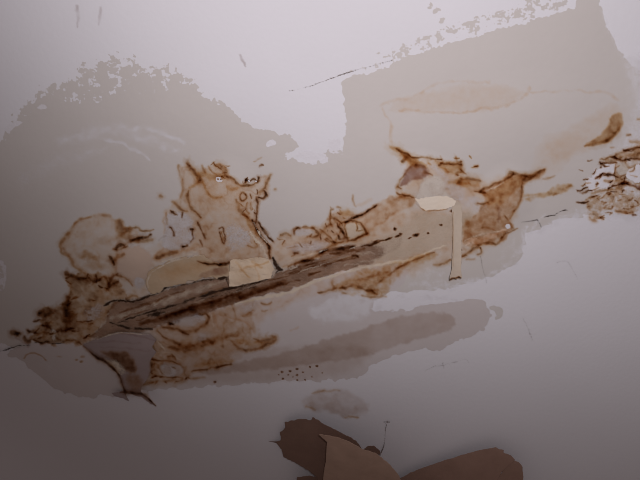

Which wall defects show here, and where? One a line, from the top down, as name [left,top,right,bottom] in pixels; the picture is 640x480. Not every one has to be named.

leakage [156,210,205,262]
leakage [214,164,274,259]
peeling [417,239,453,261]
peeling [425,207,452,218]
leakage [430,159,501,213]
peeling [575,166,640,227]
leakage [65,272,119,289]
leakage [10,297,75,344]
leakage [163,312,214,343]
peeling [83,332,156,406]